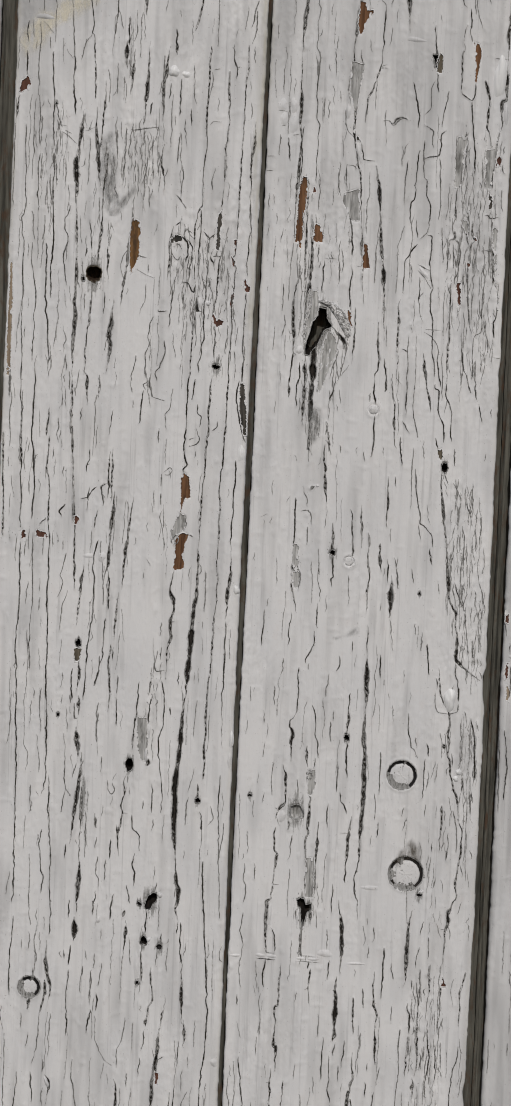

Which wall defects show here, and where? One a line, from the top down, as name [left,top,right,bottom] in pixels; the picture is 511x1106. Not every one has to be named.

peeling [357,1,375,35]
peeling [294,176,324,250]
peeling [129,217,142,275]
peeling [304,289,319,343]
peeling [317,332,339,393]
peeling [170,473,191,571]